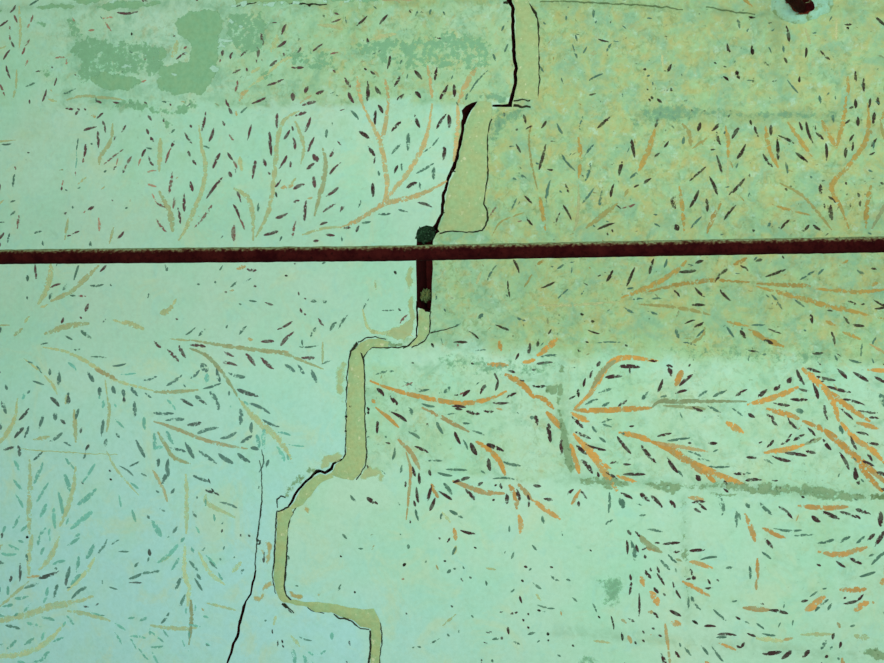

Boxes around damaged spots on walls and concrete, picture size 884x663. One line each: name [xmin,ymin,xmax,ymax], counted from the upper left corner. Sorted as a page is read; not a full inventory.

flaking render [36,0,301,128]
flaking render [356,31,491,70]
crack [706,6,755,15]
crack [227,0,683,663]